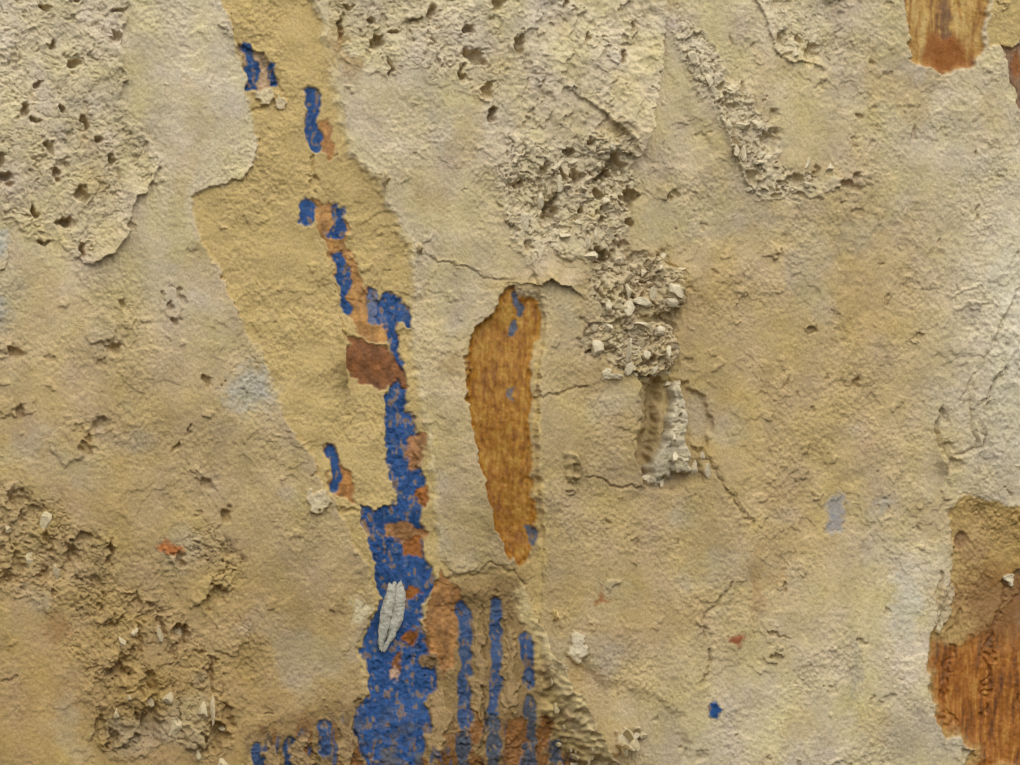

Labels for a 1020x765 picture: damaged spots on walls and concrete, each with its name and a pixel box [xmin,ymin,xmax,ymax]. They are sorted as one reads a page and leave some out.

peeling [0,0,167,264]
spalling [171,423,193,454]
peeling [186,0,714,765]
peeling [0,470,240,765]